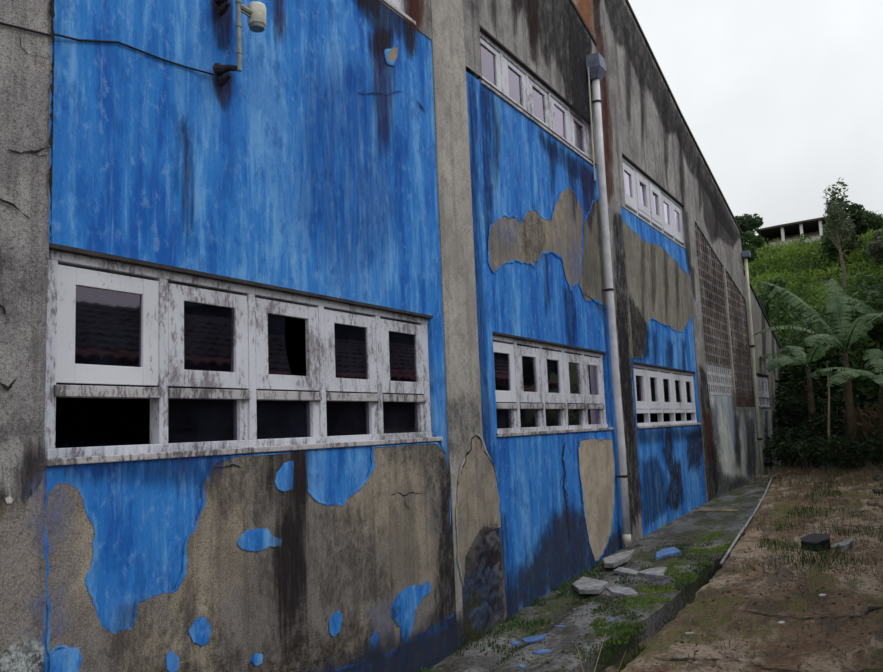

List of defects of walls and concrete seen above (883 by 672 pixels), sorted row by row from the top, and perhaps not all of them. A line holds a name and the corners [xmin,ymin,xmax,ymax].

corrosion [408,0,424,28]
corrosion [578,0,606,64]
crack [0,198,30,219]
crack [8,0,55,241]
peeling [487,184,608,313]
corrosion [600,75,614,201]
water stain [513,0,741,300]
crack [0,377,18,391]
water stain [240,76,500,672]
peeling [0,434,501,672]
peeling [578,436,616,562]
water stain [0,640,45,672]